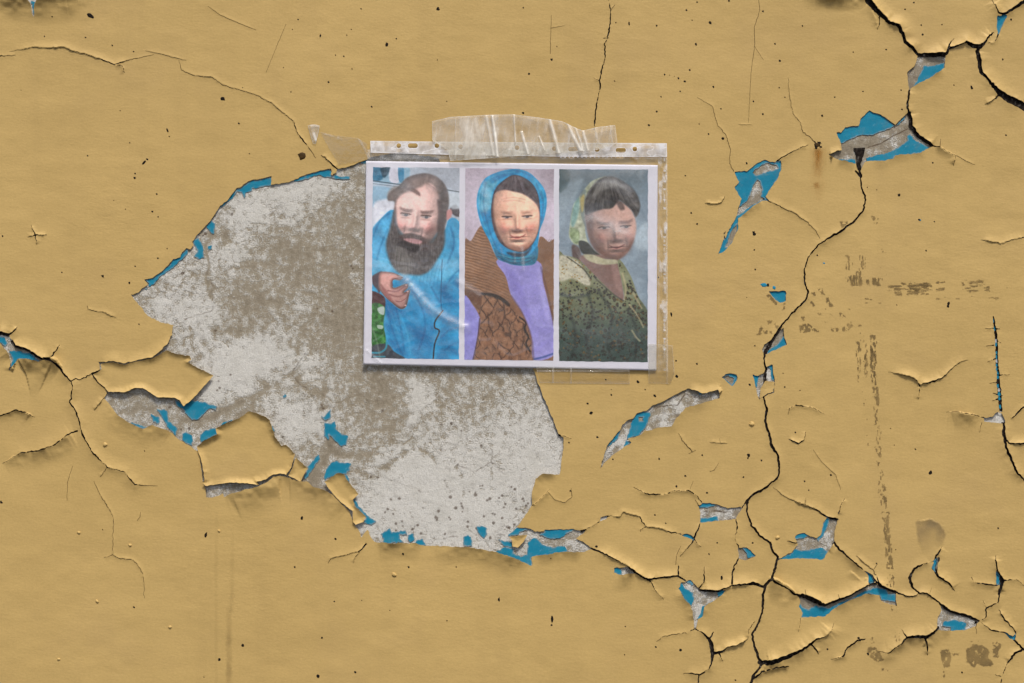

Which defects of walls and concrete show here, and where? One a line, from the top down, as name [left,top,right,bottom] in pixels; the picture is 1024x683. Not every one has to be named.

crack [0,25,337,169]
crack [594,3,615,130]
crack [699,5,763,171]
crack [776,79,816,162]
peeling [829,110,931,170]
crack [906,90,974,166]
crack [865,0,1024,111]
peeling [719,160,781,254]
crack [0,327,153,598]
peeling [93,152,591,566]
peeling [601,373,738,467]
crack [580,148,1024,683]